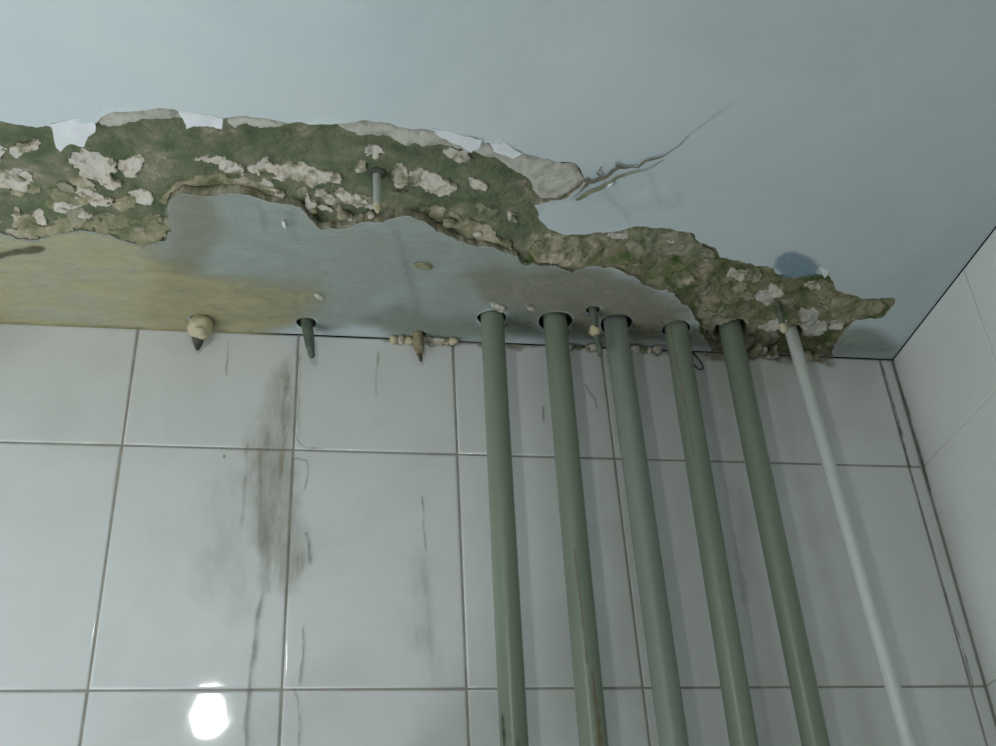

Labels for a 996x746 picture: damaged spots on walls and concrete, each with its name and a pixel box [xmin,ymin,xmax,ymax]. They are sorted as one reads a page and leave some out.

flaking render [0,108,895,356]
crack [571,136,689,201]